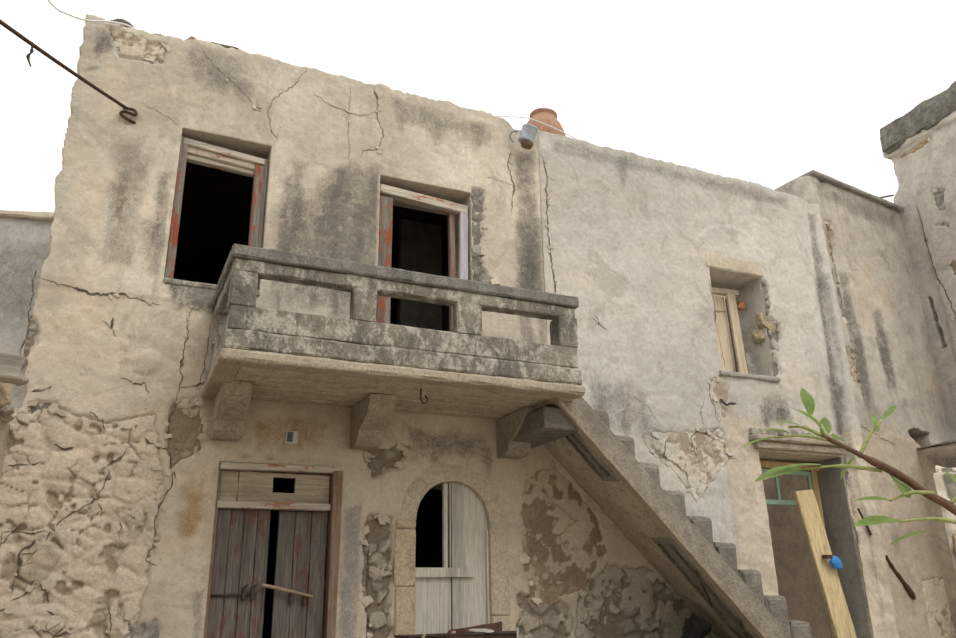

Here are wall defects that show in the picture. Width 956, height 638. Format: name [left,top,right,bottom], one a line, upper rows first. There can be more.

crack [203,50,384,158]
crack [19,270,159,355]
damp [283,172,377,263]
spalling [471,190,500,284]
crack [541,154,558,294]
crack [917,208,956,321]
spalling [0,397,209,638]
crack [0,304,213,638]
spalling [360,512,393,638]
spalling [516,466,697,638]
spalling [642,376,734,502]
spalling [651,537,758,638]